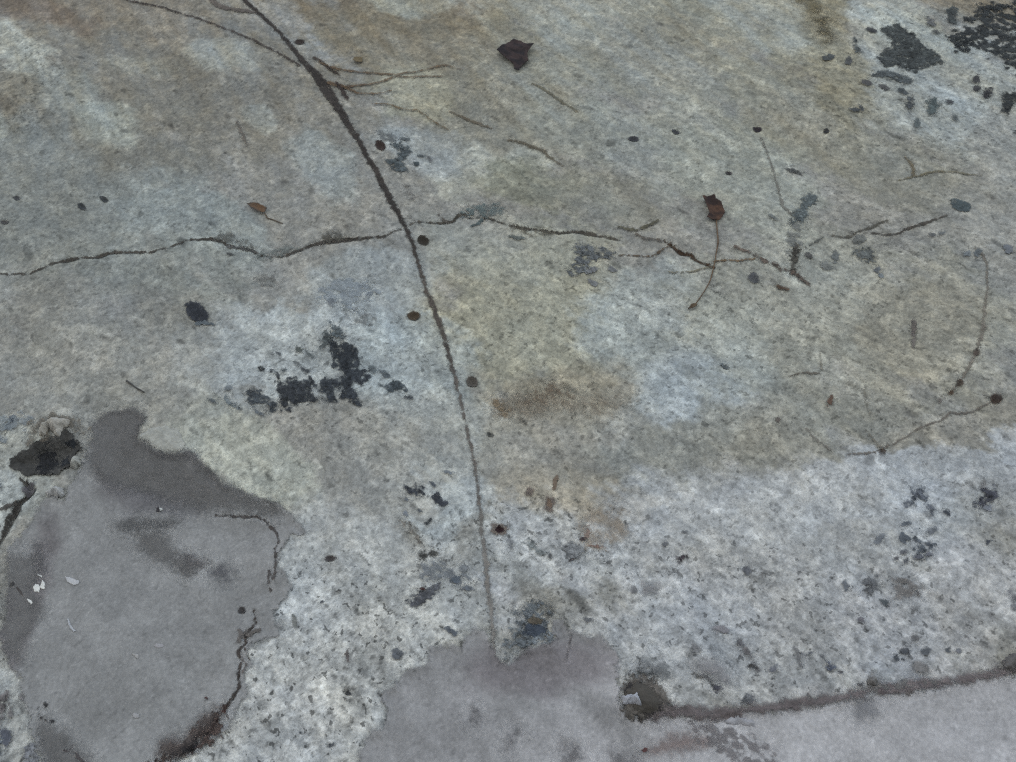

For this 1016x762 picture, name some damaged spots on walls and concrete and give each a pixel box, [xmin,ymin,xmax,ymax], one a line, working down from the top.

water stain [861,23,959,127]
water stain [926,0,1016,75]
water stain [972,74,1016,115]
crack [760,137,792,215]
crack [0,0,756,657]
crack [790,352,822,376]
water stain [399,481,474,609]
spalling [0,407,306,762]
crack [224,609,261,711]
water stain [501,599,555,660]
water stain [619,660,673,724]
crack [647,646,1016,722]